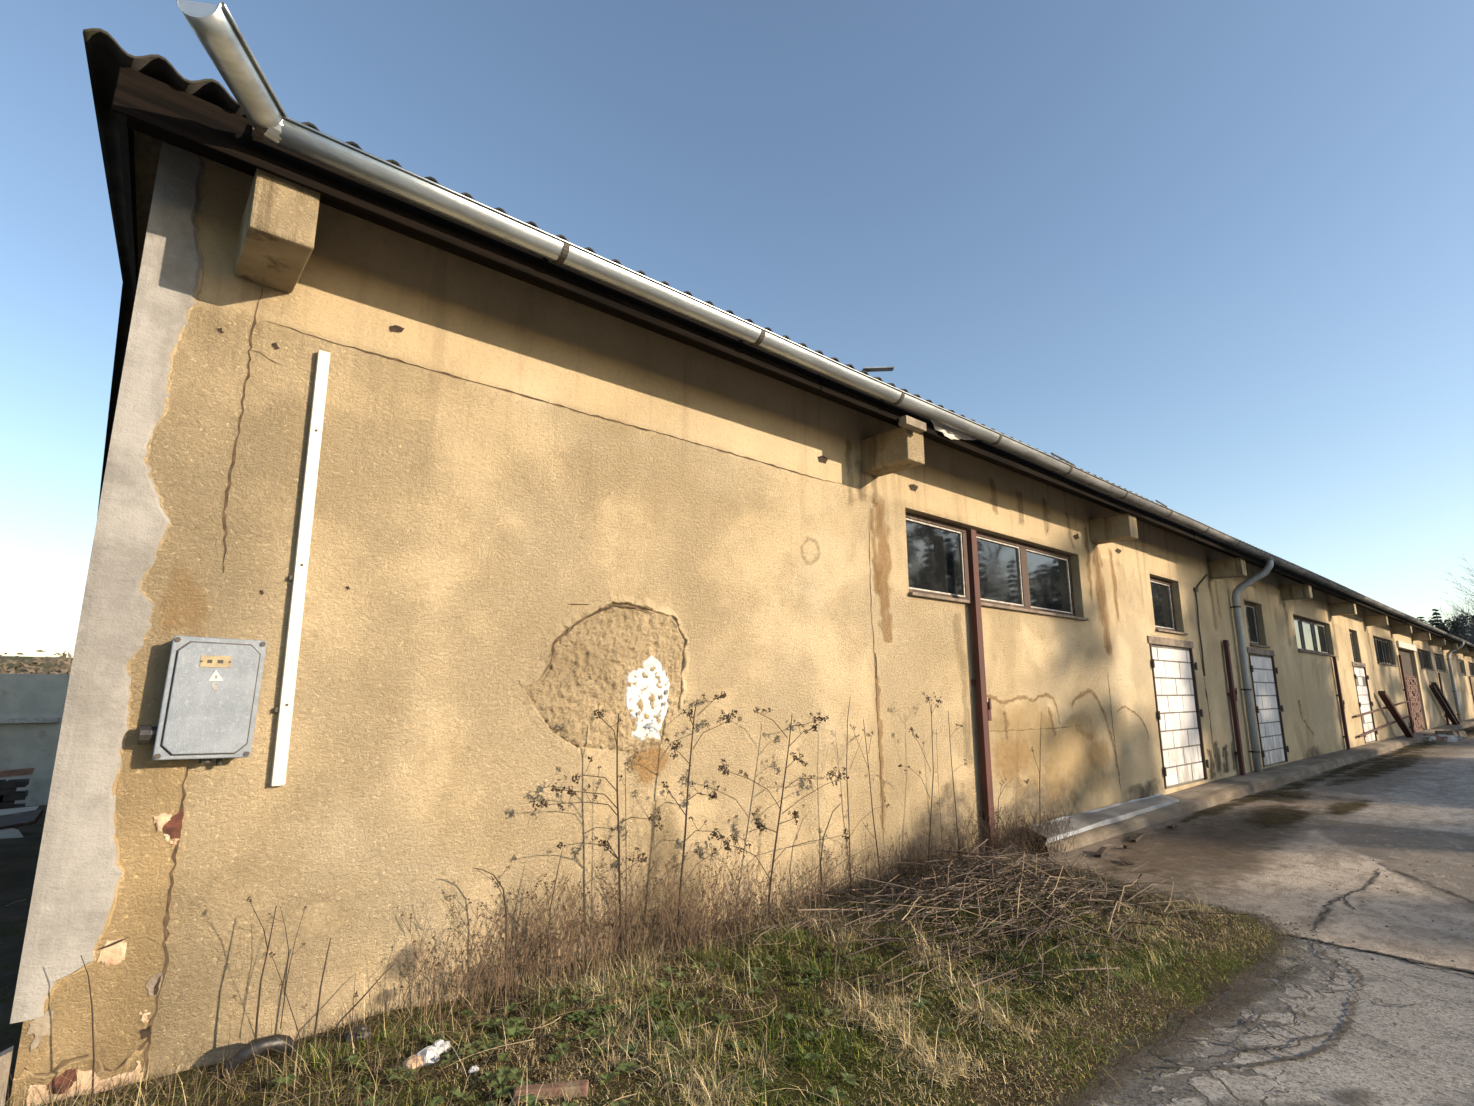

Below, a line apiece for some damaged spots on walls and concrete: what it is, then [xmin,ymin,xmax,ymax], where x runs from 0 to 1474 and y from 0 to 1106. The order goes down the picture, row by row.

crack [222,287,841,573]
corrosion [871,501,892,638]
crack [976,725,1076,733]
flaking render [153,809,184,847]
crack [24,767,188,1079]
flaking render [97,938,127,966]
crack [1159,859,1473,1070]
flaking render [17,973,163,1106]